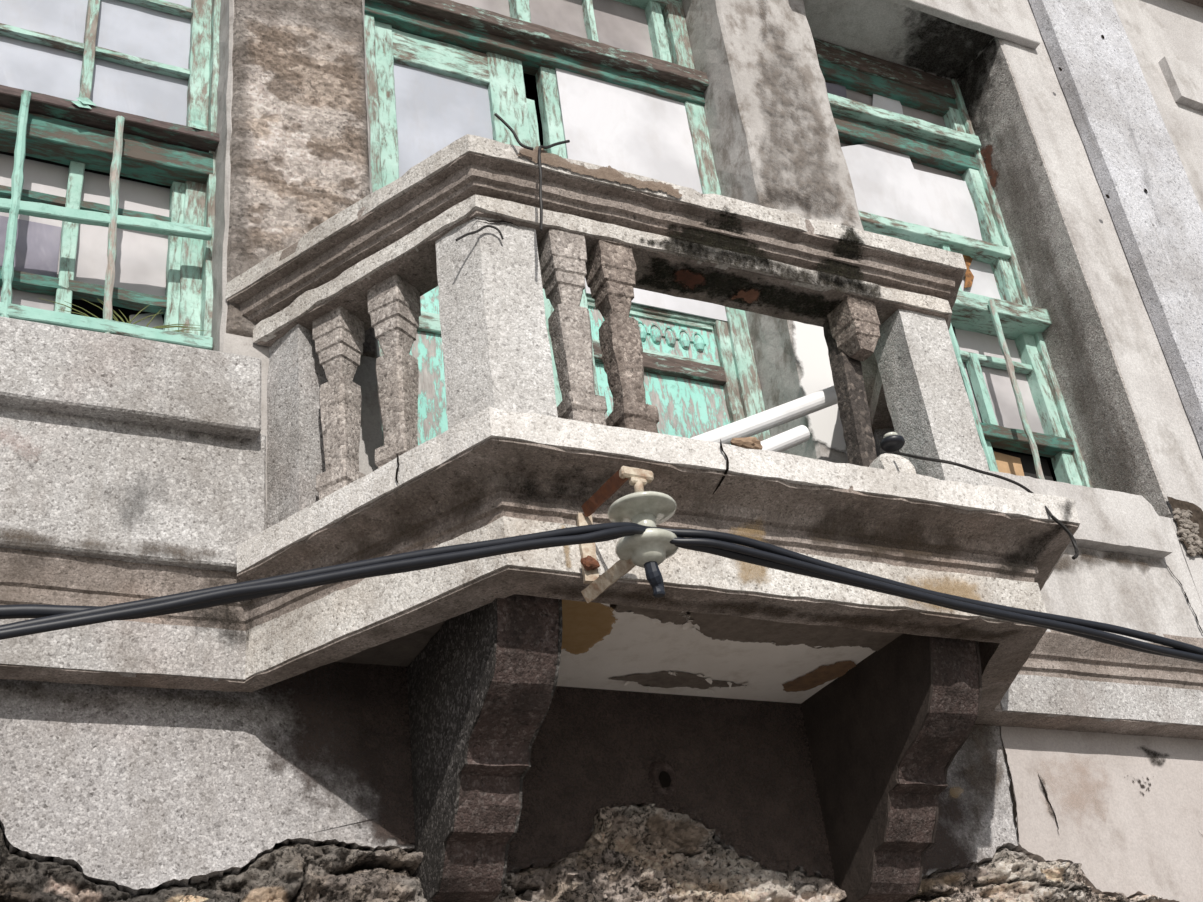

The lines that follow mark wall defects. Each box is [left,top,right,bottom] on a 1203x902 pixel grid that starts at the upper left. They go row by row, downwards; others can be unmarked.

leakage [897,12,1000,163]
leakage [636,3,881,322]
crack [713,439,729,494]
leakage [998,501,1072,576]
spalling [1167,496,1203,557]
crack [1166,565,1203,633]
peeling [609,671,749,693]
crack [1000,739,1059,842]
spalling [0,822,439,902]
spalling [493,804,847,902]
spalling [906,847,1162,902]